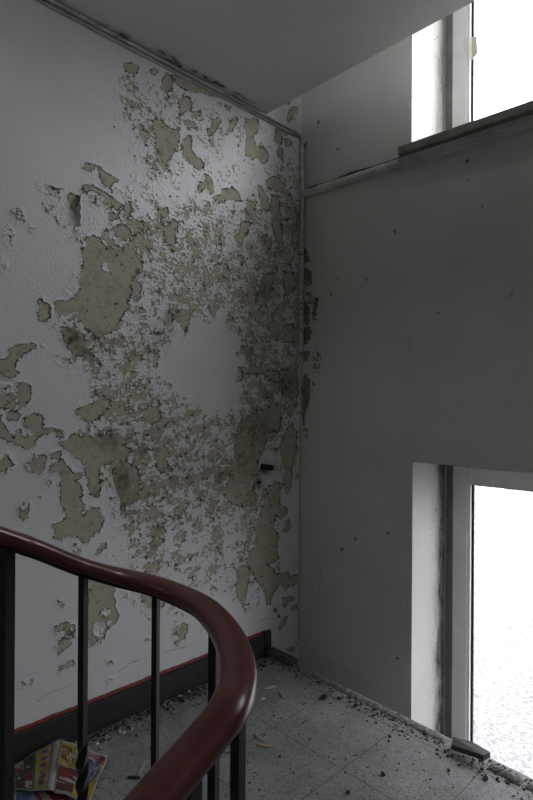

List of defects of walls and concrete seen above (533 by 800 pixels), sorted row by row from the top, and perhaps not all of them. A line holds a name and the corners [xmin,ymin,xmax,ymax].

peeling [0,50,325,635]
peeling [49,616,78,679]
peeling [88,580,205,650]